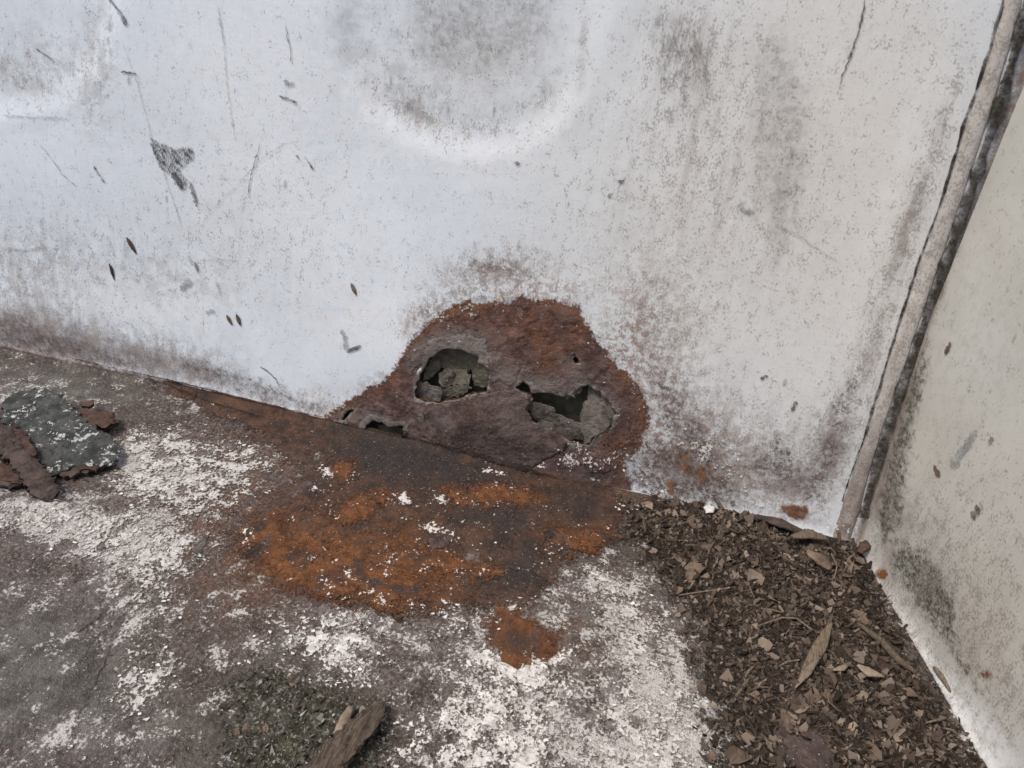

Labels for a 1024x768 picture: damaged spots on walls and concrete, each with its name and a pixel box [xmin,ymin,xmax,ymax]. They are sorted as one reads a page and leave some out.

peeling [416,349,490,402]
peeling [529,385,615,467]
rust [147,294,674,676]
rust [781,505,808,519]
mould [879,354,968,674]
peeling [0,417,287,749]
peeling [238,601,394,703]